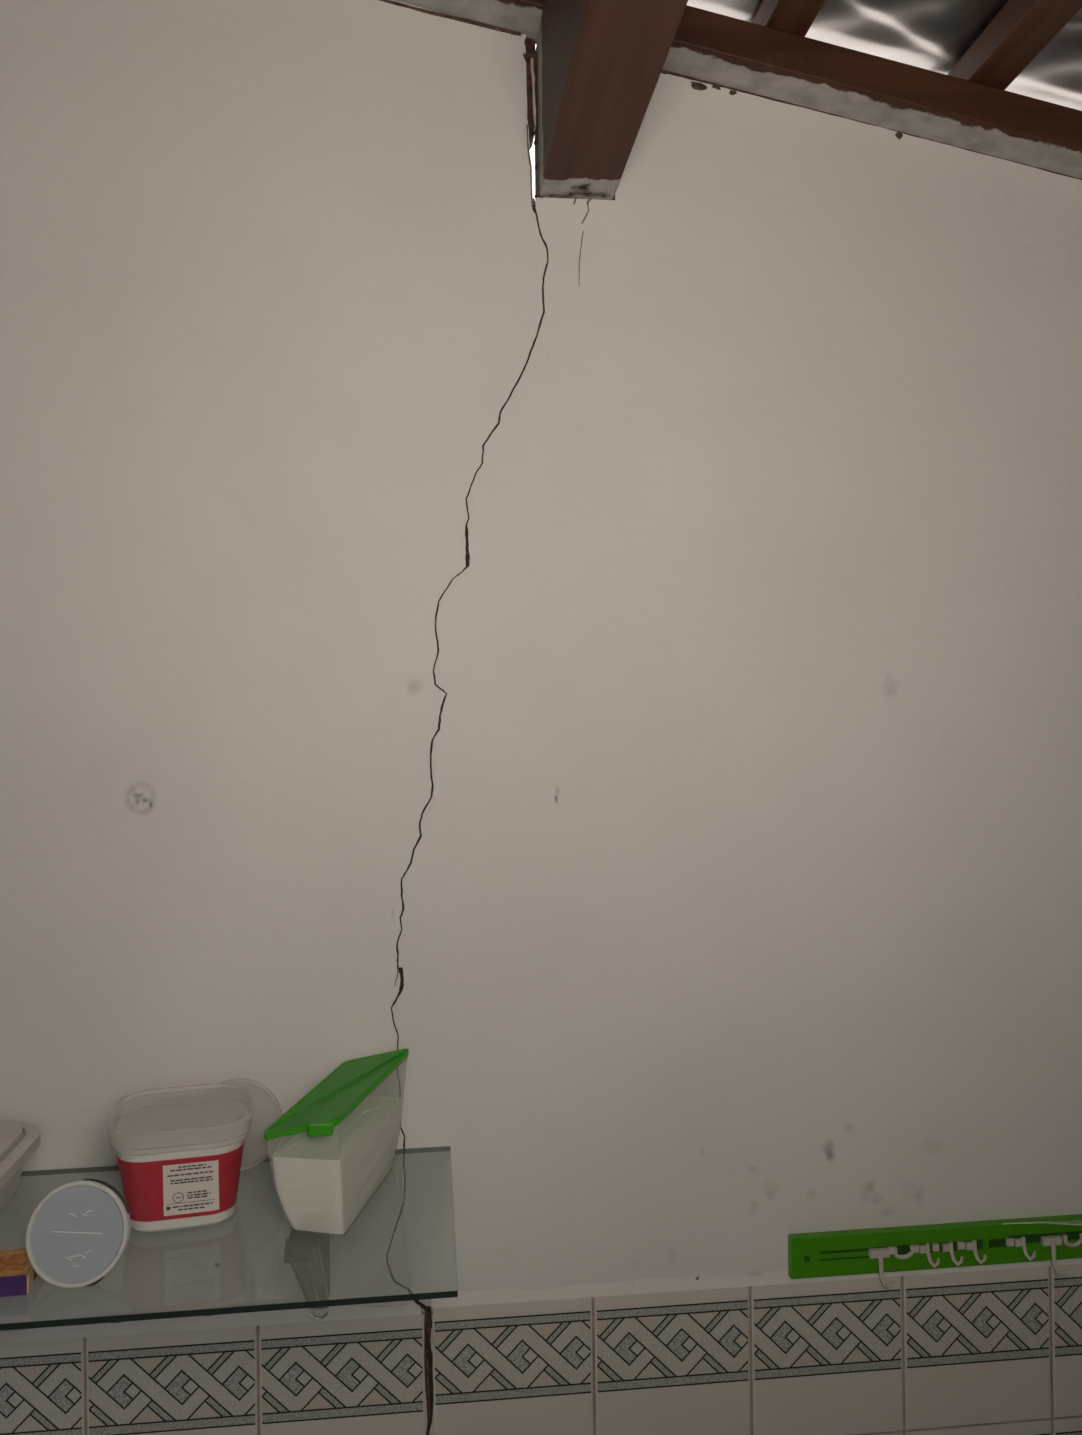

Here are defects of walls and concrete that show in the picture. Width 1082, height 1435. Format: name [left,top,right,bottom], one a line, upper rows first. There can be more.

crack [386,198,592,1435]